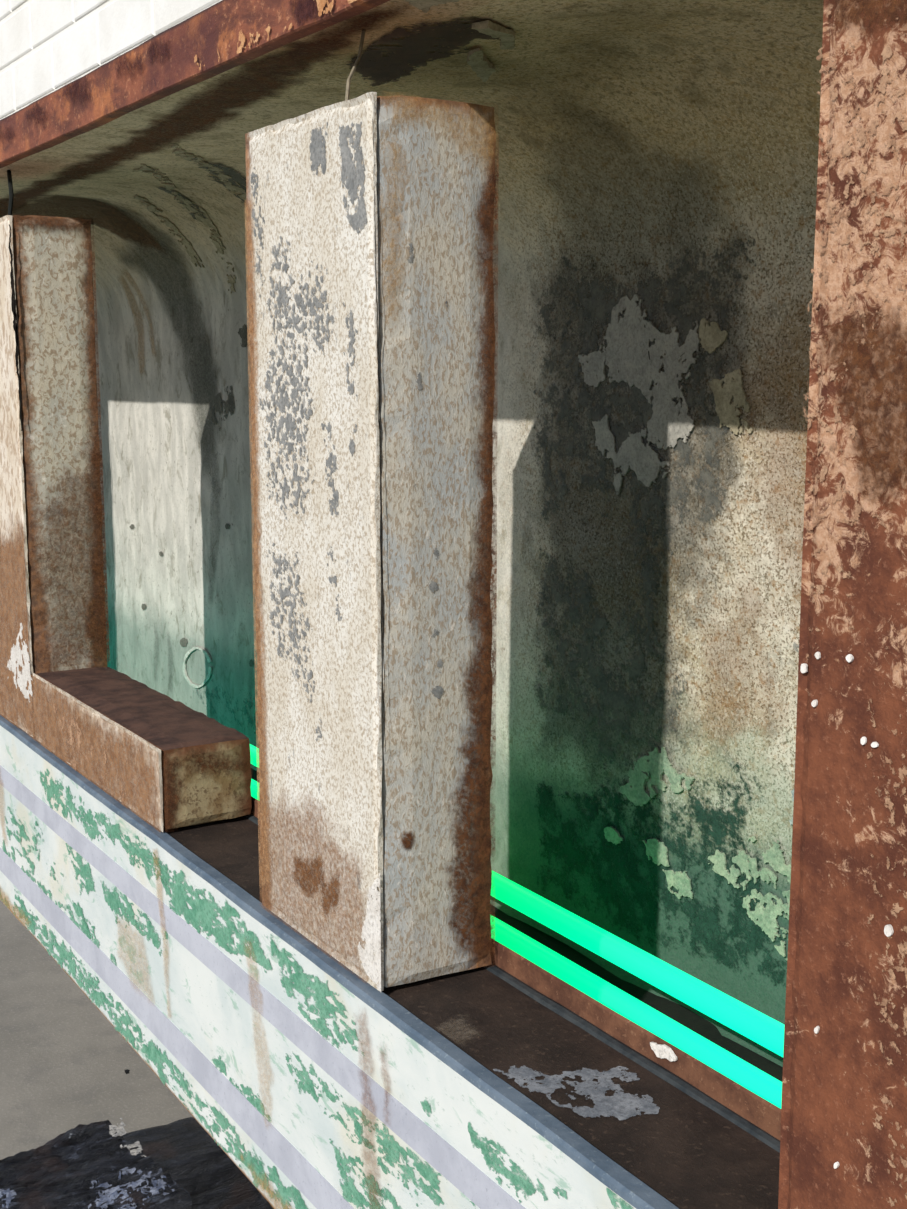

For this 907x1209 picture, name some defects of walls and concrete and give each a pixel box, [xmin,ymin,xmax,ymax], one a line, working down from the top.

rust [290,0,317,26]
rust [835,0,907,29]
peeling [309,121,367,233]
rust [0,11,397,969]
peeling [171,143,359,523]
rust [449,155,499,961]
peeling [578,294,728,495]
rust [825,312,907,496]
peeling [536,747,791,986]
peeling [285,1052,447,1209]
peeling [468,1122,567,1203]
peeling [493,1065,660,1120]